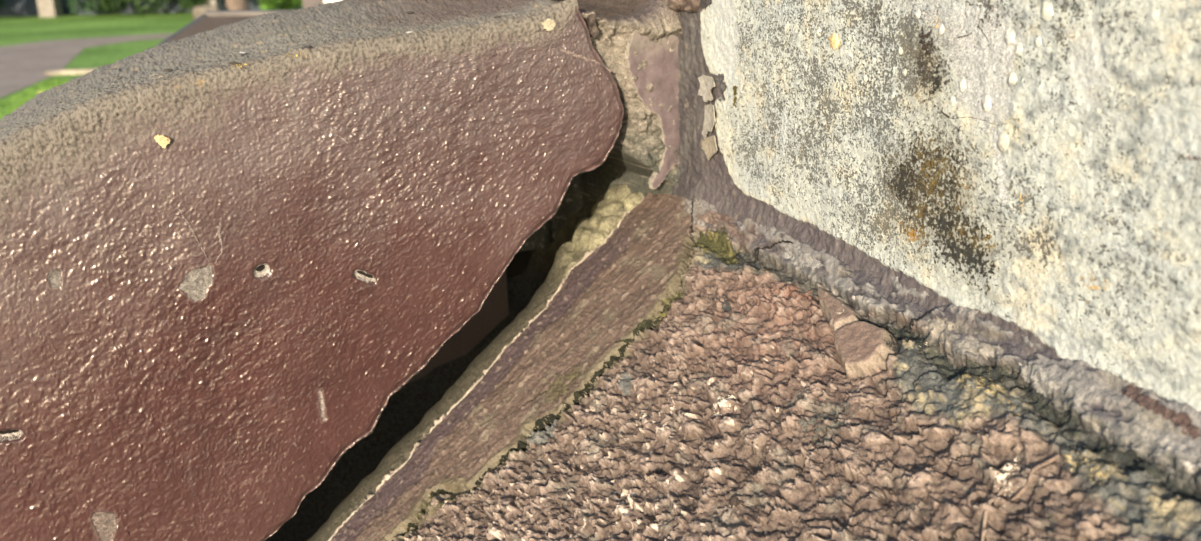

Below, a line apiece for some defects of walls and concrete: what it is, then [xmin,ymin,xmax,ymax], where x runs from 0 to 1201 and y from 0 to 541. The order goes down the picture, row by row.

damp [906,18,950,111]
spalling [518,0,683,252]
peeling [698,73,727,161]
crack [688,198,696,245]
damp [878,123,1076,295]
peeling [179,264,213,301]
crack [265,184,683,541]